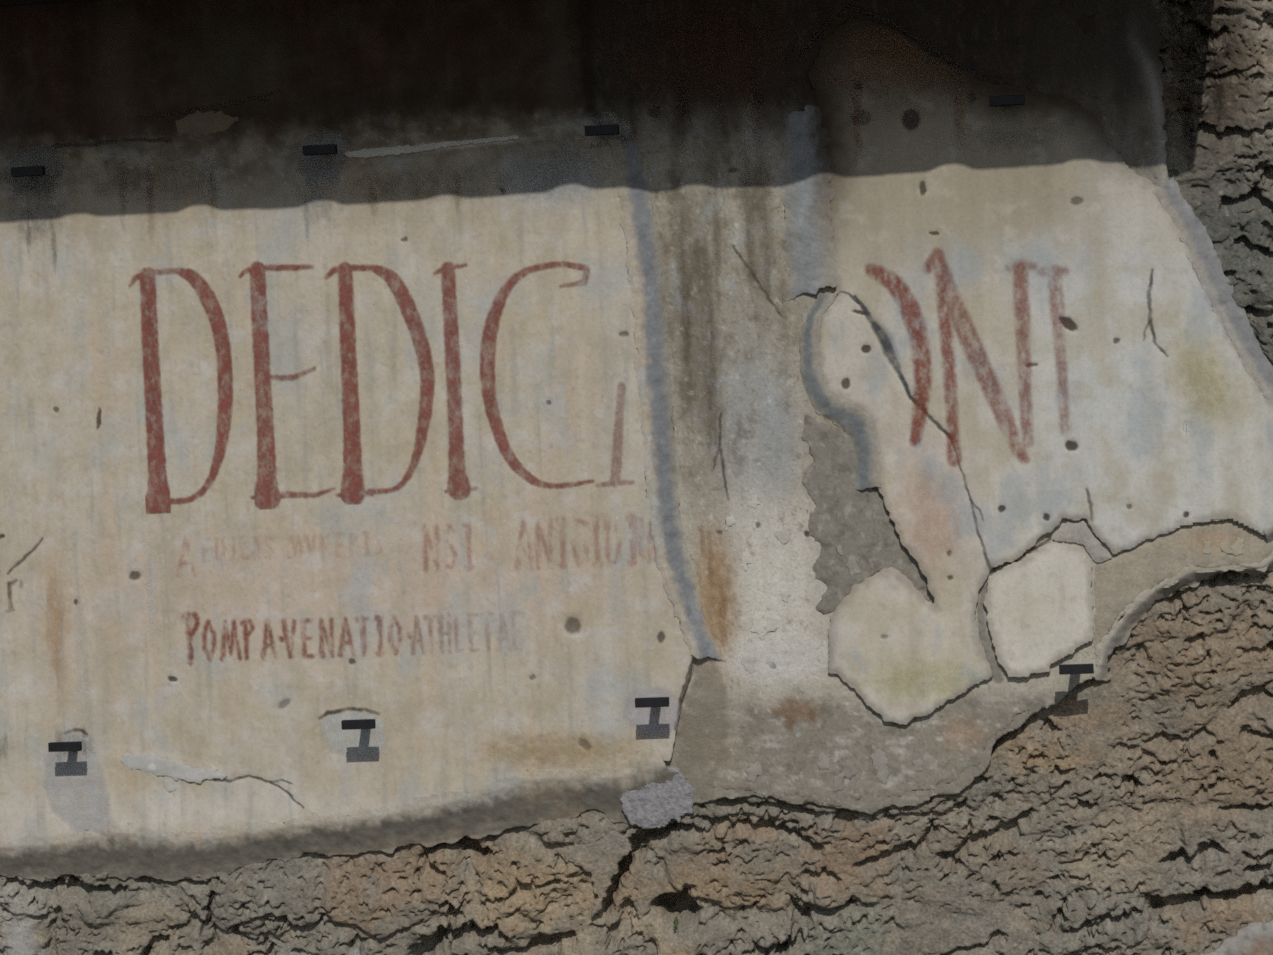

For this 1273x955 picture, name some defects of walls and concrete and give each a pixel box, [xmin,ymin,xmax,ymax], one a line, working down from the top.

crack [849,294,950,437]
crack [1149,274,1165,353]
flaking render [605,110,1029,806]
crack [212,775,303,807]